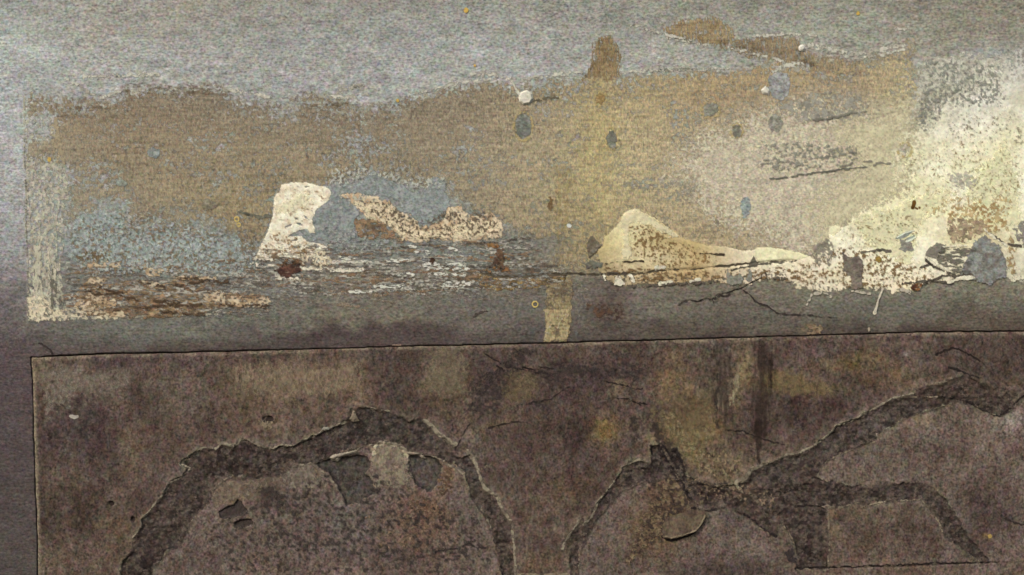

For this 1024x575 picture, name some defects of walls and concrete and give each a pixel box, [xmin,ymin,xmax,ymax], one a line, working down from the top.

peeling [27,167,504,323]
corrosion [274,258,305,278]
leakage [33,237,584,342]
peeling [585,208,863,289]
crack [679,272,835,318]
peeling [896,221,1024,285]
leakage [754,346,830,463]
spalling [119,407,517,575]
spalling [561,374,1021,575]